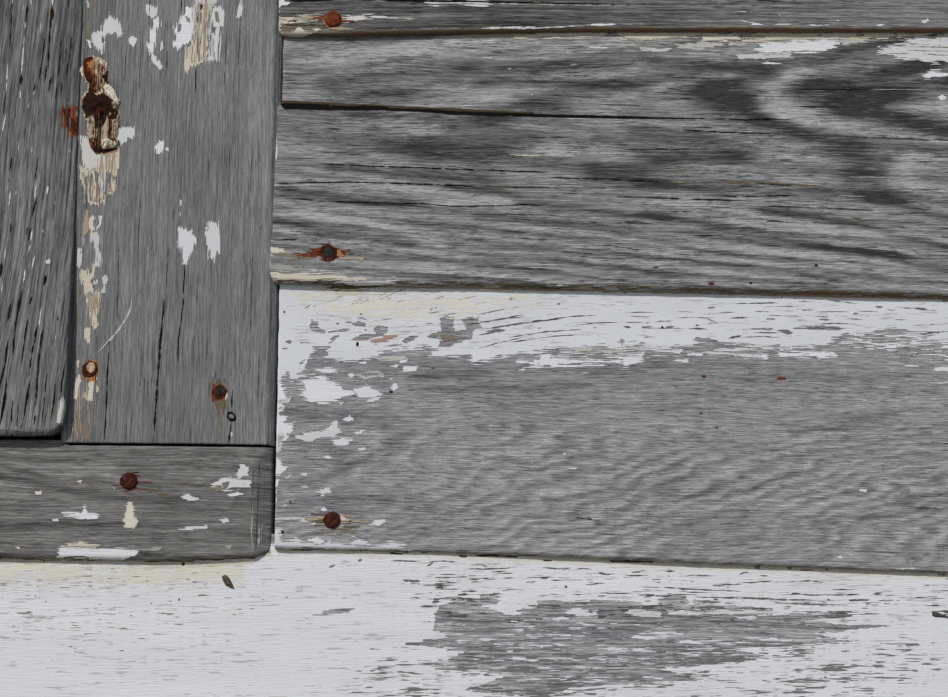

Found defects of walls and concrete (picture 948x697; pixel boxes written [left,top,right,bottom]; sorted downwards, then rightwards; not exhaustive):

corrosion [293,14,355,30]
peeling [453,11,948,80]
corrosion [60,56,118,202]
corrosion [272,243,364,262]
corrosion [72,358,98,441]
peeling [0,247,948,697]
corrosion [297,510,370,540]